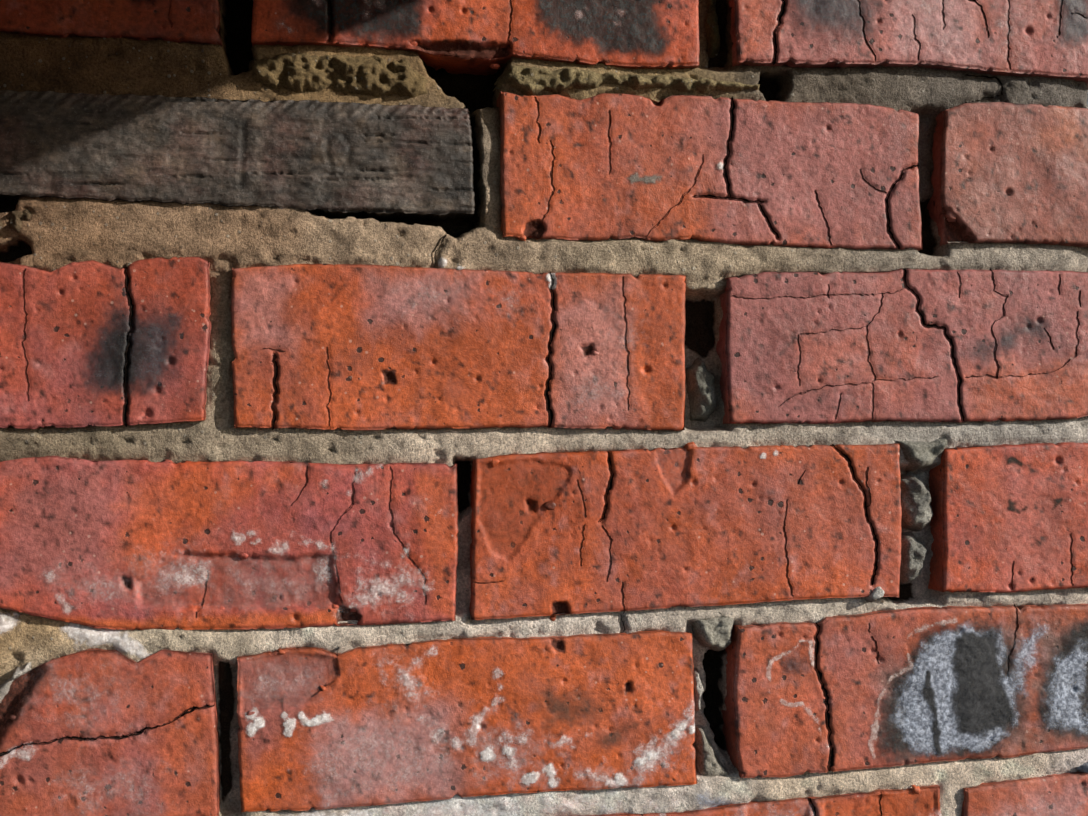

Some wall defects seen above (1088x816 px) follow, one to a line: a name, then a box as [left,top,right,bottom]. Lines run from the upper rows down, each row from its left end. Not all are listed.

crack [649,96,779,238]
crack [545,272,557,427]
crack [732,165,1081,421]
crack [833,444,878,585]
crack [0,704,214,757]
leakage [246,708,265,736]
leakage [282,712,332,737]
leakage [301,807,386,816]
leakage [453,670,557,787]
leakage [587,770,626,788]
leakage [635,713,695,770]
crack [815,623,834,771]